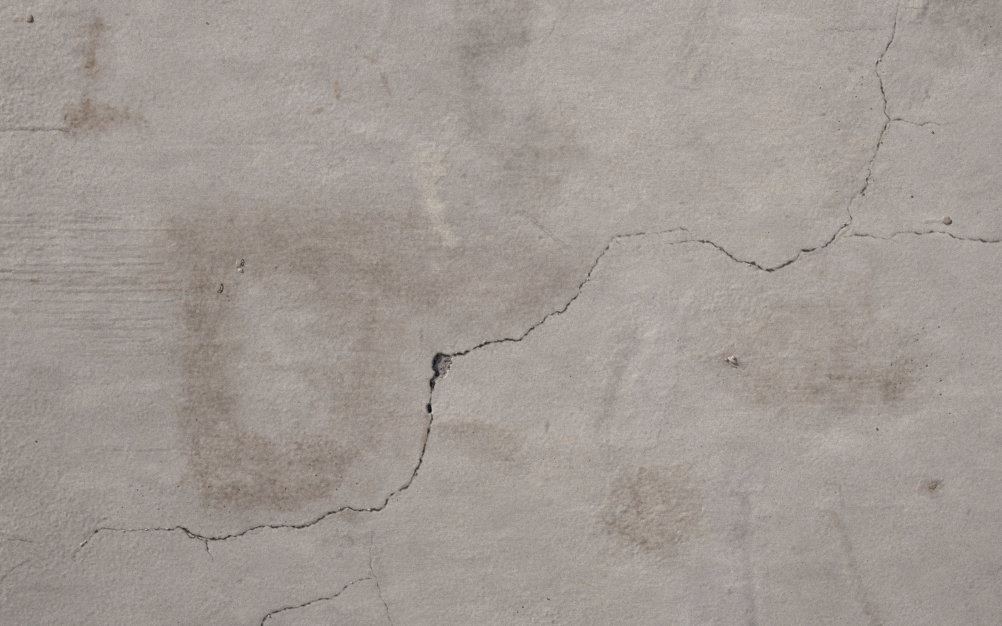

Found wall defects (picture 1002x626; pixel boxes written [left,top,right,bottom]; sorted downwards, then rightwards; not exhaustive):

leakage [129,0,627,591]
crack [73,22,929,557]
crack [261,567,390,626]